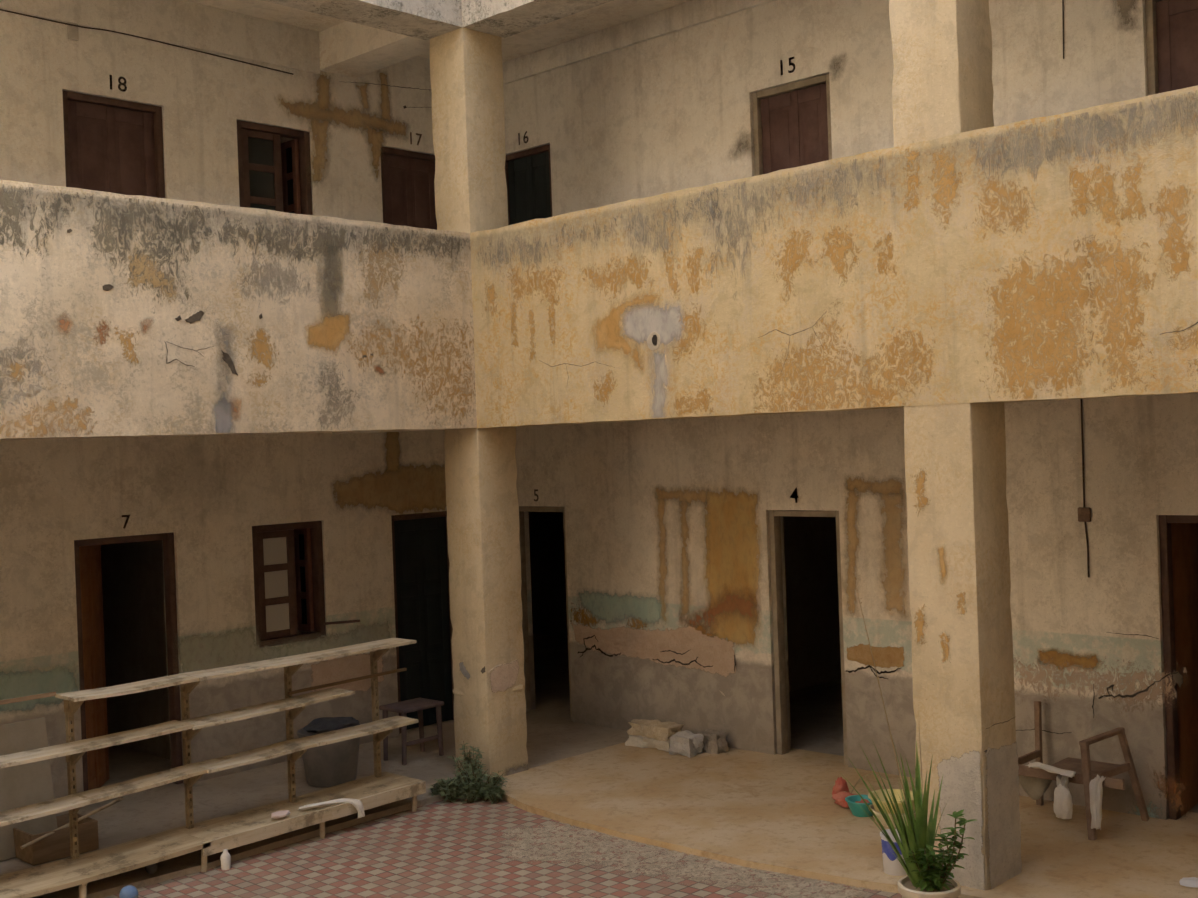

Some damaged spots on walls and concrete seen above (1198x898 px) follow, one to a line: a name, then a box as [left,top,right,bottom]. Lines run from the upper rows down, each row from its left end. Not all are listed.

leakage [281,73,407,181]
leakage [0,184,475,425]
leakage [482,263,563,359]
leakage [582,247,719,418]
crack [758,311,827,372]
leakage [0,391,99,437]
flaking render [569,603,736,677]
flaking render [847,644,904,668]
crack [986,672,1178,734]